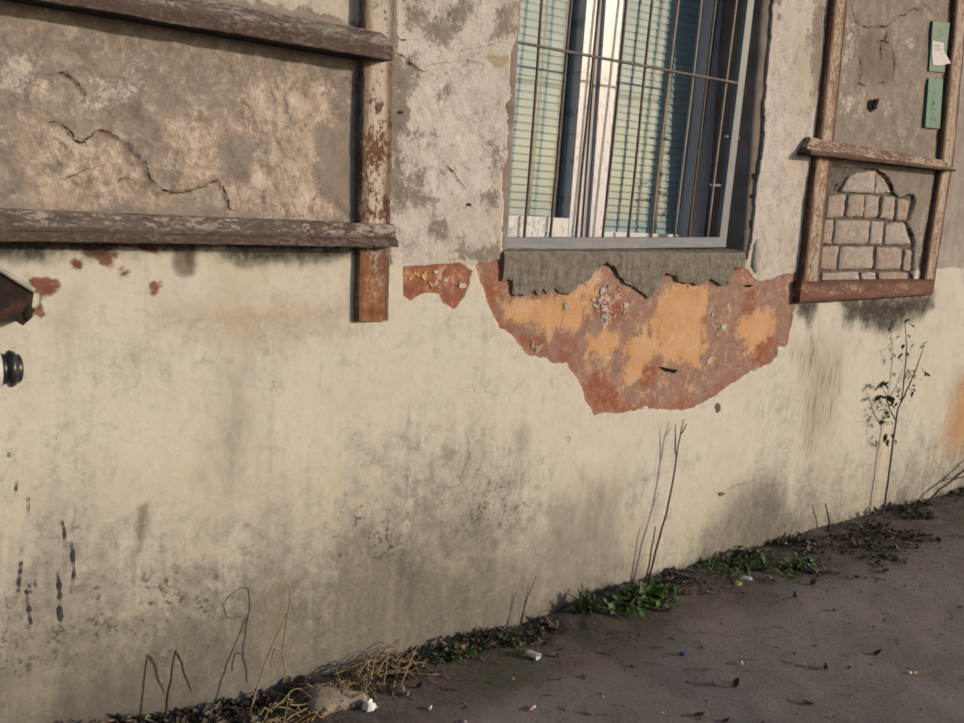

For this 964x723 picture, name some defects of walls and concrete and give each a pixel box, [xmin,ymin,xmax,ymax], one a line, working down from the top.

crack [850,0,934,86]
crack [41,119,240,213]
corrosion [30,277,61,317]
corrosion [72,246,118,268]
corrosion [138,244,159,254]
leakage [175,246,193,273]
peeling [403,259,797,415]
flaking render [820,165,915,280]